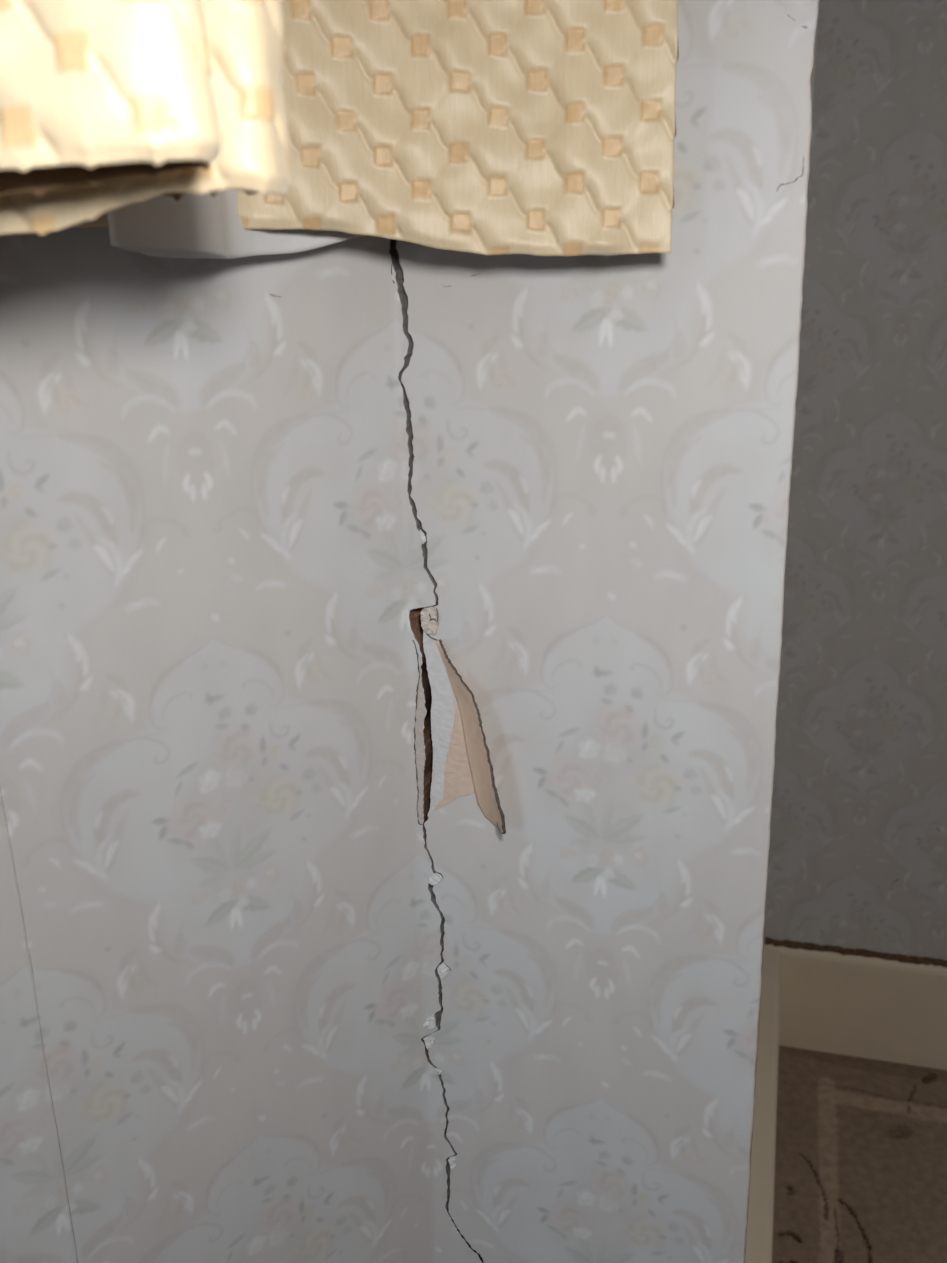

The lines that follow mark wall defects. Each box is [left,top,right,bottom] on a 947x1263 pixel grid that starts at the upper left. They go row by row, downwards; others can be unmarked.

crack [389,239,484,1263]